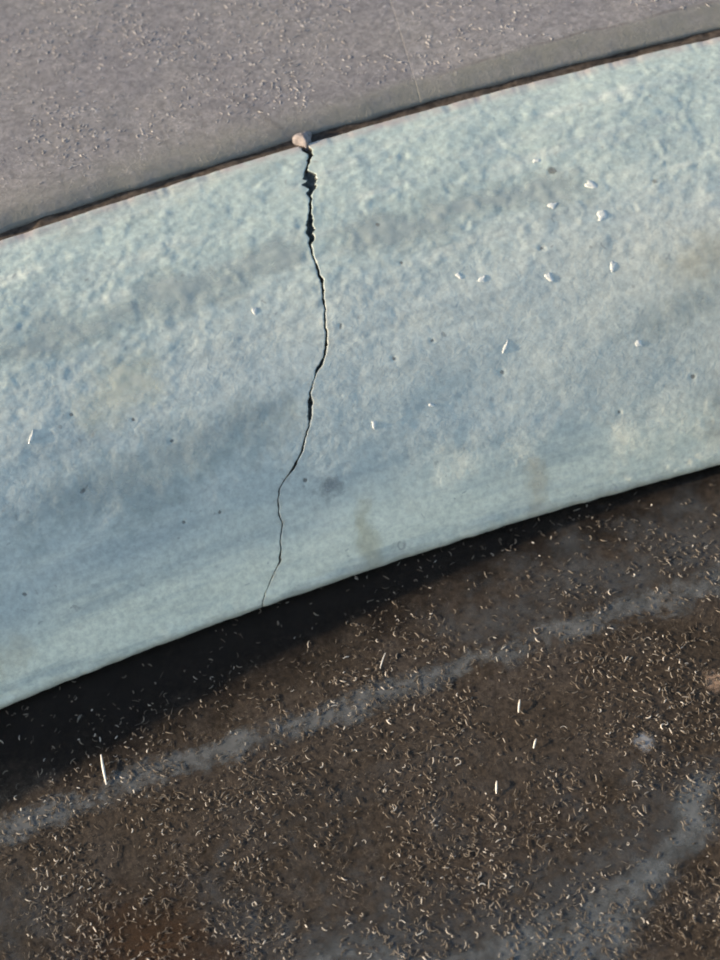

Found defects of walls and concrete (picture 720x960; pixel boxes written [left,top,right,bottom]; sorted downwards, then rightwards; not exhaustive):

crack [262,145,328,606]
water stain [0,465,720,846]